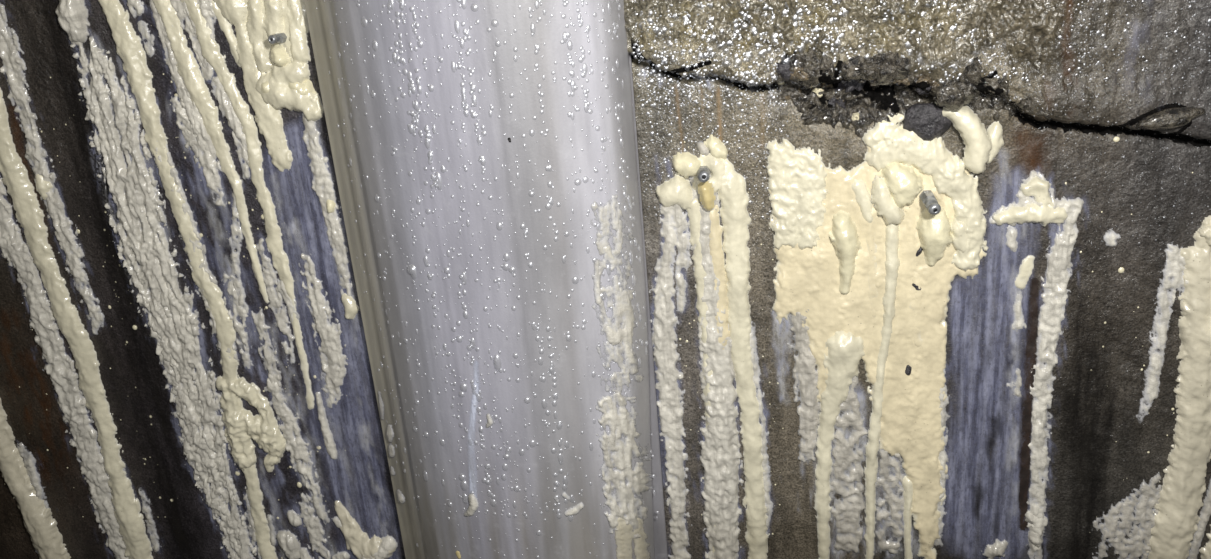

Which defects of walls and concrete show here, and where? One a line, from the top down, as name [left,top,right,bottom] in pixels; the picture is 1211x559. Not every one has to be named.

crack [631,38,843,93]
crack [983,71,1211,148]